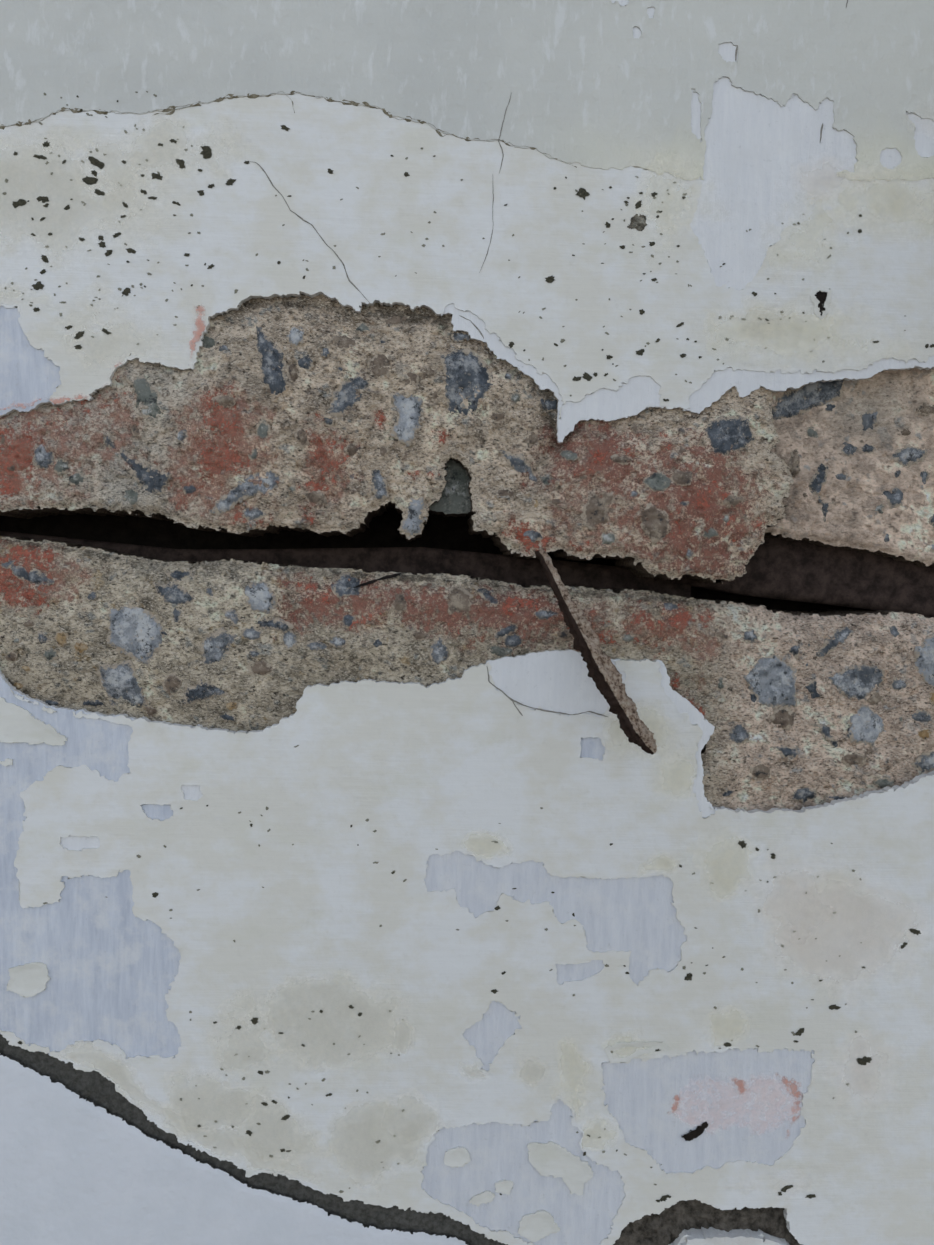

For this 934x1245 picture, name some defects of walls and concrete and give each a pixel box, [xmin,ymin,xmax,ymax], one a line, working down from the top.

crack [0,91,577,273]
crack [249,161,370,303]
spalling [627,214,647,231]
spalling [810,286,832,319]
rust [0,365,277,527]
rust [296,413,363,525]
rust [0,540,91,615]
rust [271,570,578,651]
crack [0,508,934,617]
spalling [0,294,934,1058]
peeling [421,1099,802,1245]
peeling [601,1041,815,1173]